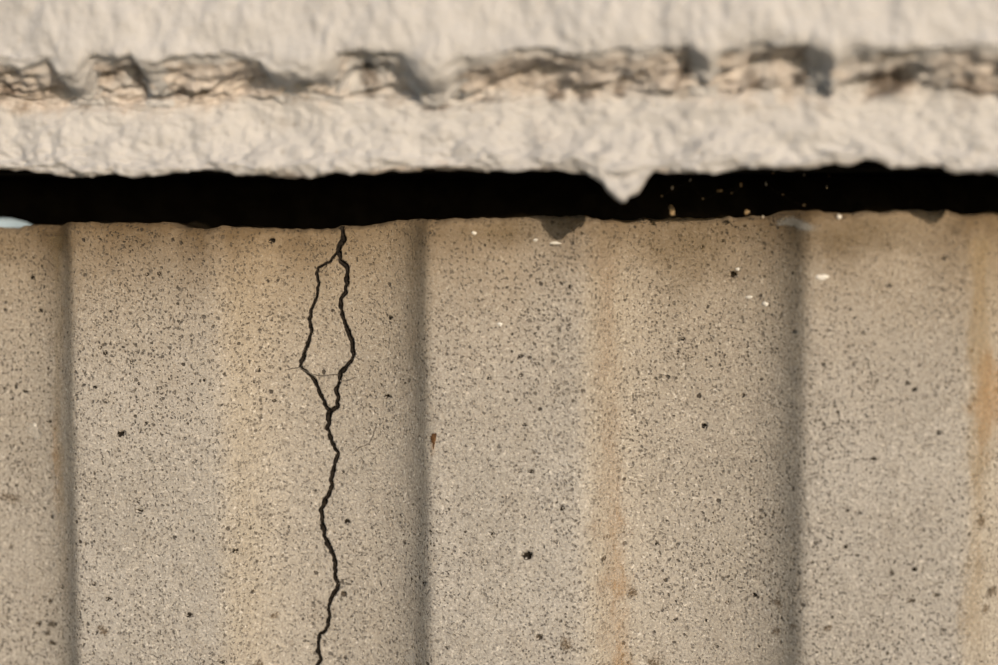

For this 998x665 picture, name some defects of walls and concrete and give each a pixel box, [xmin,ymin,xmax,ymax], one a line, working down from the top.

crack [286,226,377,665]